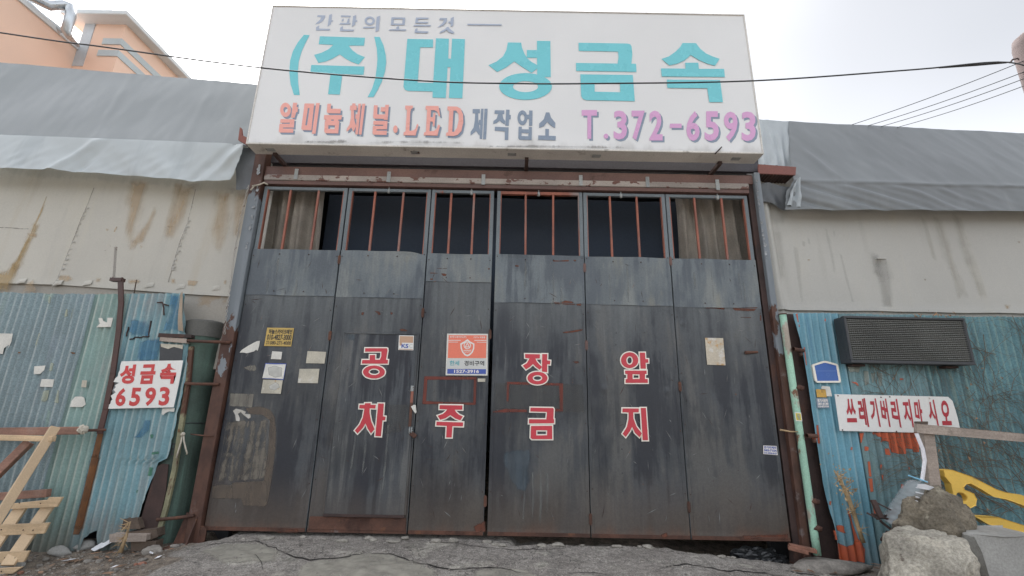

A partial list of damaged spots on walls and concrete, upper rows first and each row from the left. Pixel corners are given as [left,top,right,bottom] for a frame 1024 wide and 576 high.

rust [0,207,43,289]
peeling [851,432,919,492]
peeling [834,511,865,563]